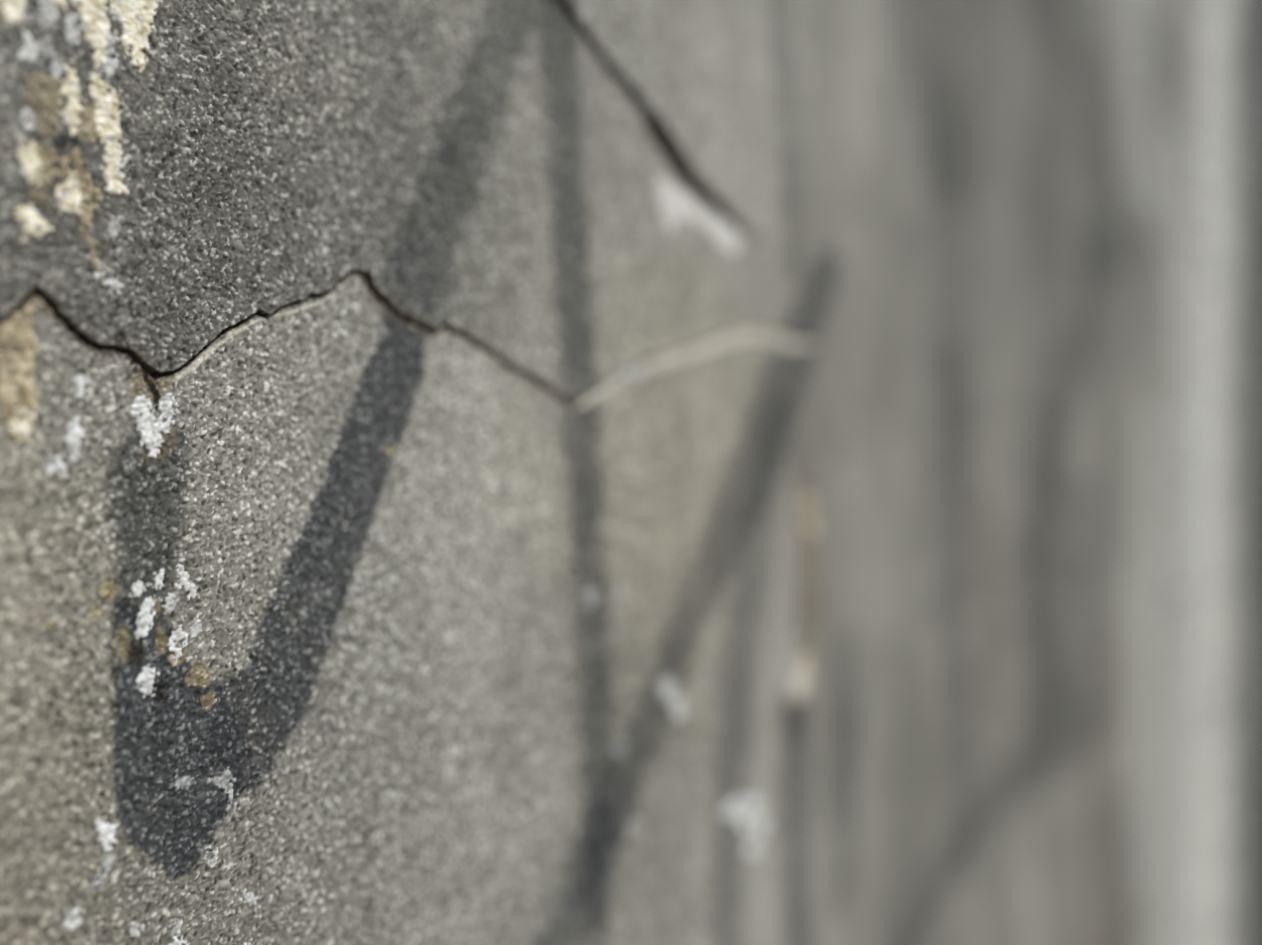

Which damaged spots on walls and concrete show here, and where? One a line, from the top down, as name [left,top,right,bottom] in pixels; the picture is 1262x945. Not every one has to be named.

peeling [0,0,38,61]
peeling [14,0,162,295]
crack [556,0,745,233]
crack [0,269,818,411]